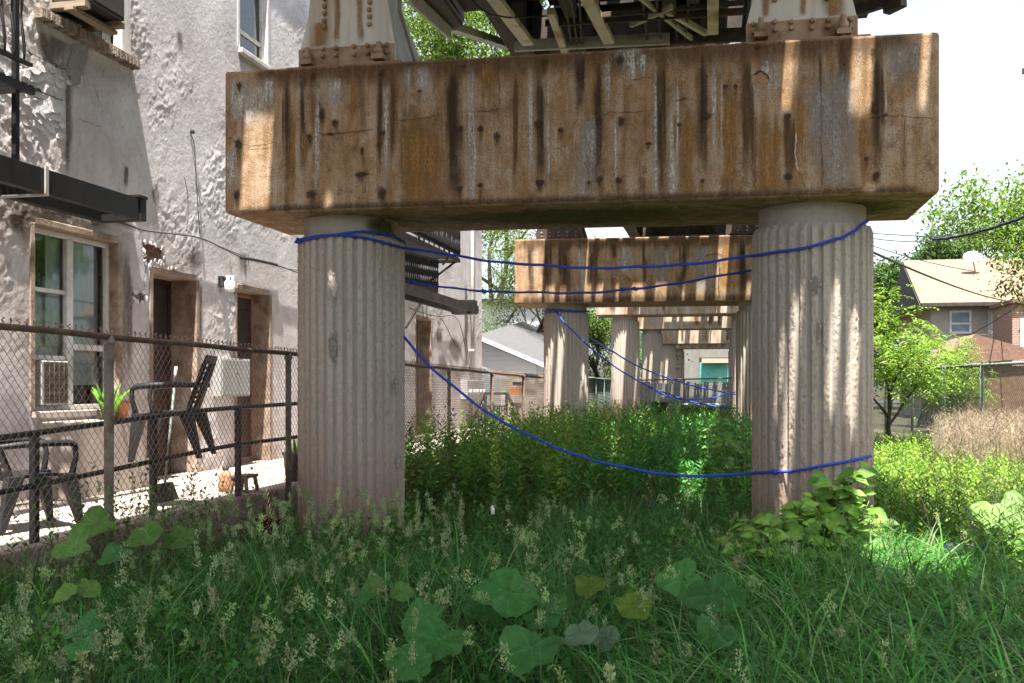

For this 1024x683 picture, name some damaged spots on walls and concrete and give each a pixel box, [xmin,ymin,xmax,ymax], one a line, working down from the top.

corrosion [299,0,395,83]
corrosion [291,126,312,191]
crack [316,101,371,141]
leakage [231,35,918,236]
corrosion [674,113,711,192]
corrosion [723,84,737,181]
corrosion [860,131,880,180]
crack [872,115,927,165]
spalling [142,240,178,271]